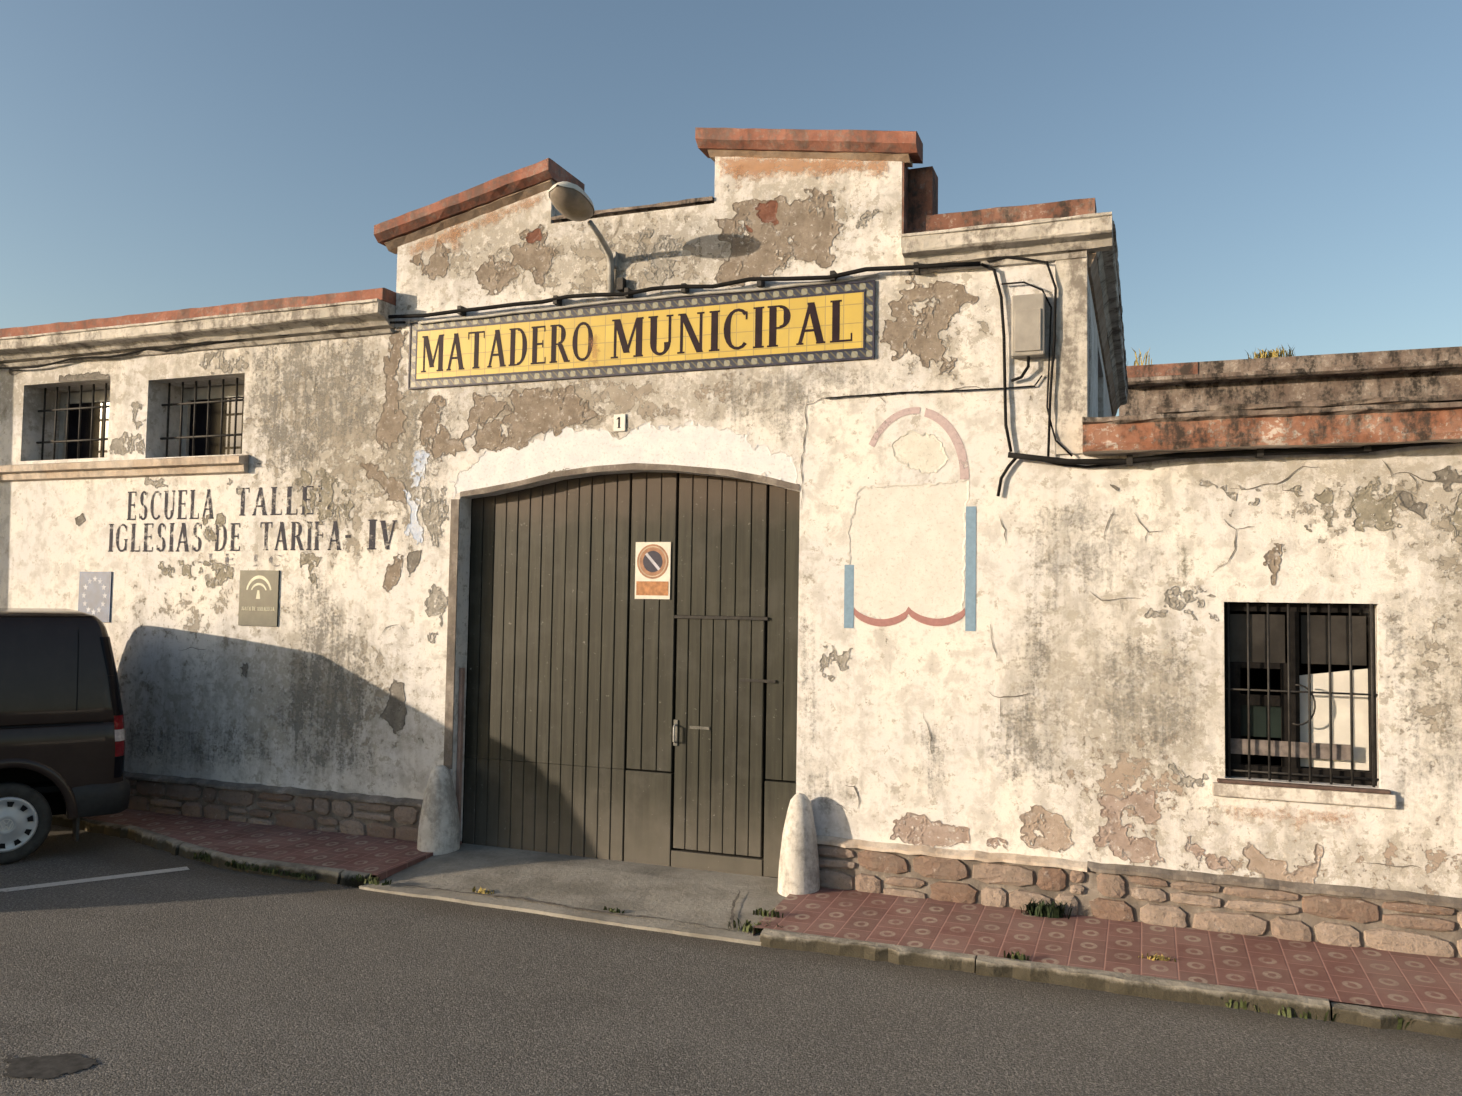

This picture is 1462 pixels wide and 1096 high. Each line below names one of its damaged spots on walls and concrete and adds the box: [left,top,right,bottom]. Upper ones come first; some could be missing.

peeling [409,239,450,280]
peeling [475,224,559,295]
peeling [714,187,879,287]
peeling [880,272,979,375]
spalling [380,679,407,734]
peeling [890,805,1074,852]
peeling [1092,788,1165,866]
peeling [1184,836,1323,884]